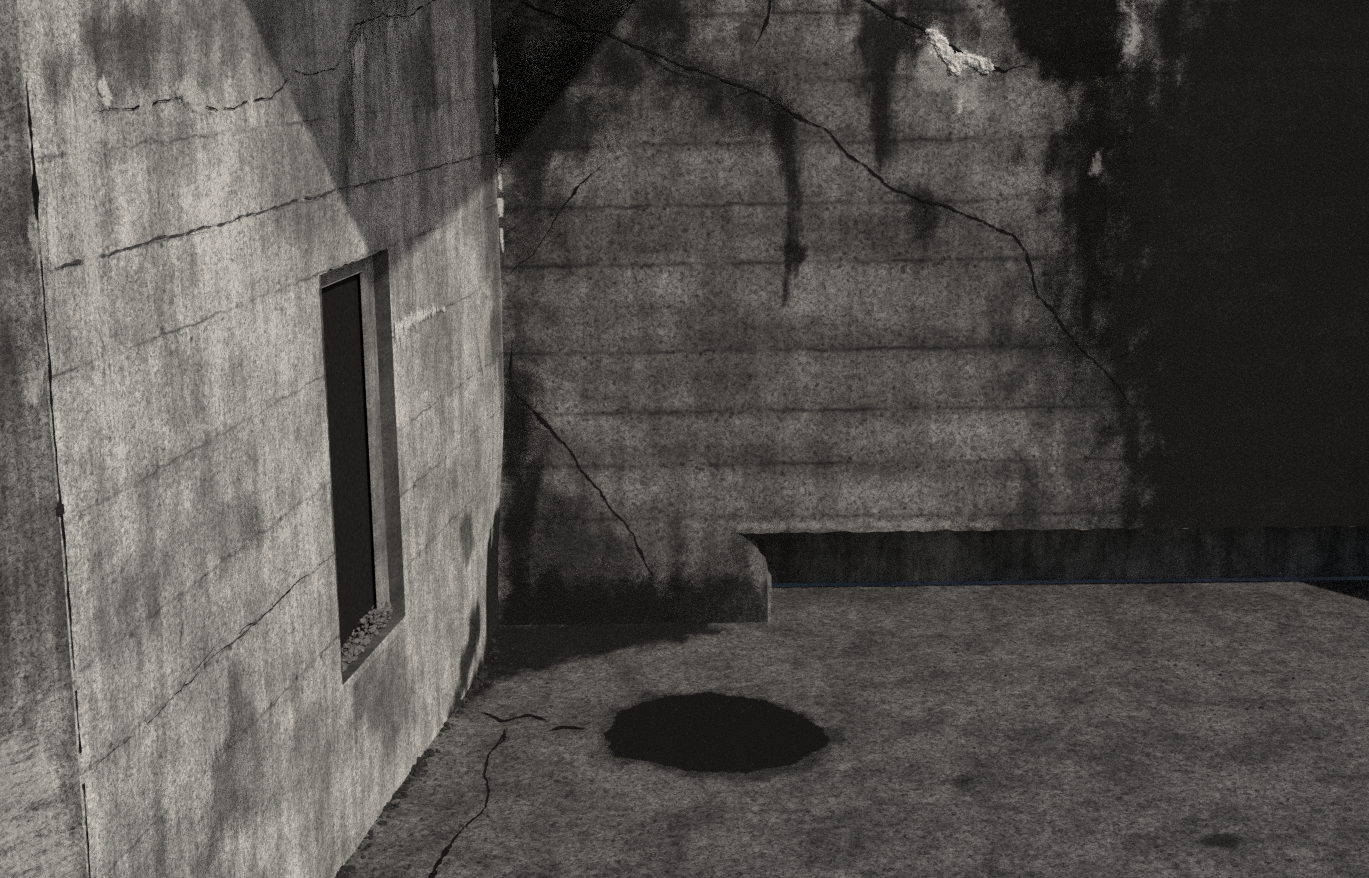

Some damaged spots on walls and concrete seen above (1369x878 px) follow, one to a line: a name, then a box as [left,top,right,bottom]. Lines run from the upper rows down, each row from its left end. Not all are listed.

leakage [492,0,806,305]
crack [511,0,1136,407]
leakage [841,0,979,165]
spalling [925,28,995,75]
leakage [998,0,1369,529]
crack [0,0,488,878]
crack [510,341,654,576]
crack [429,712,583,878]